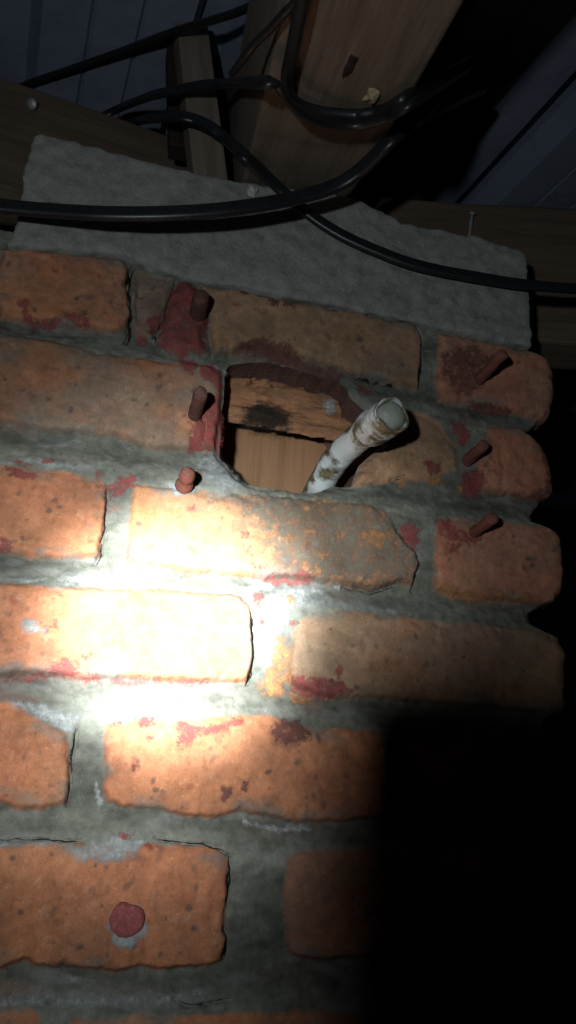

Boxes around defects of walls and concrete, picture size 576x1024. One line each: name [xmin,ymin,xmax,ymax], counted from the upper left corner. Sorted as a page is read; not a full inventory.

spalling [181,337,372,453]
spalling [343,445,380,488]
crack [98,490,107,562]
crack [67,734,75,800]
crack [0,836,82,844]
crack [155,838,231,903]